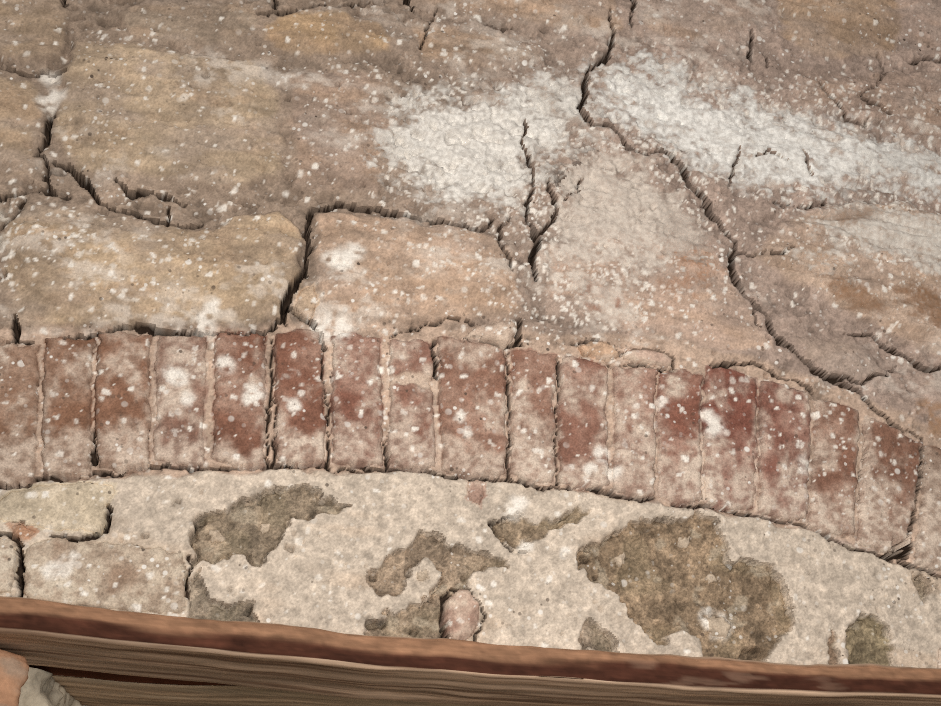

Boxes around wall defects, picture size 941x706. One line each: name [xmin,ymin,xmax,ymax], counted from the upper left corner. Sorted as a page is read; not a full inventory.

crack [0,115,204,231]
damp [374,53,941,327]
crack [6,313,35,346]
crack [64,0,941,578]
crack [0,531,26,597]
crack [0,474,64,490]
crack [51,503,114,543]
spalling [189,483,353,622]
spalling [363,529,510,639]
spalling [491,504,592,549]
spalling [576,509,796,662]
spalling [827,613,896,666]